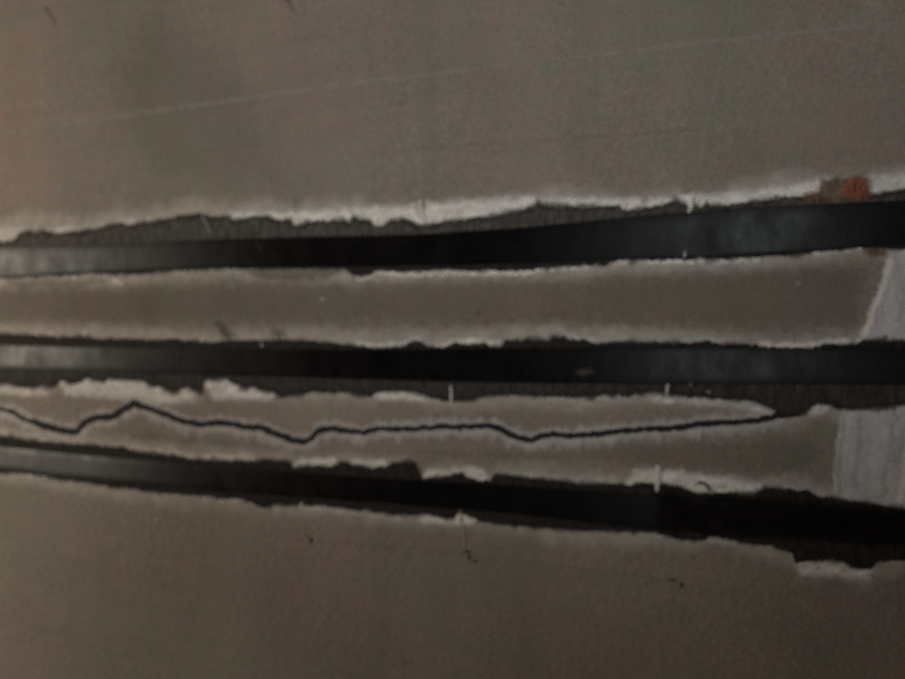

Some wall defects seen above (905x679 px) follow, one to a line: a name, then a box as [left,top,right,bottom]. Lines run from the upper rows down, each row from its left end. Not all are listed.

spalling [225,176,840,227]
corrosion [806,176,870,205]
spalling [864,173,905,195]
spalling [356,264,598,281]
spalling [352,337,503,349]
spalling [0,378,278,405]
spalling [546,392,776,415]
crack [0,398,801,451]
spalling [422,466,490,481]
spalling [503,465,763,495]
spalling [271,502,478,526]
spalling [796,559,881,580]